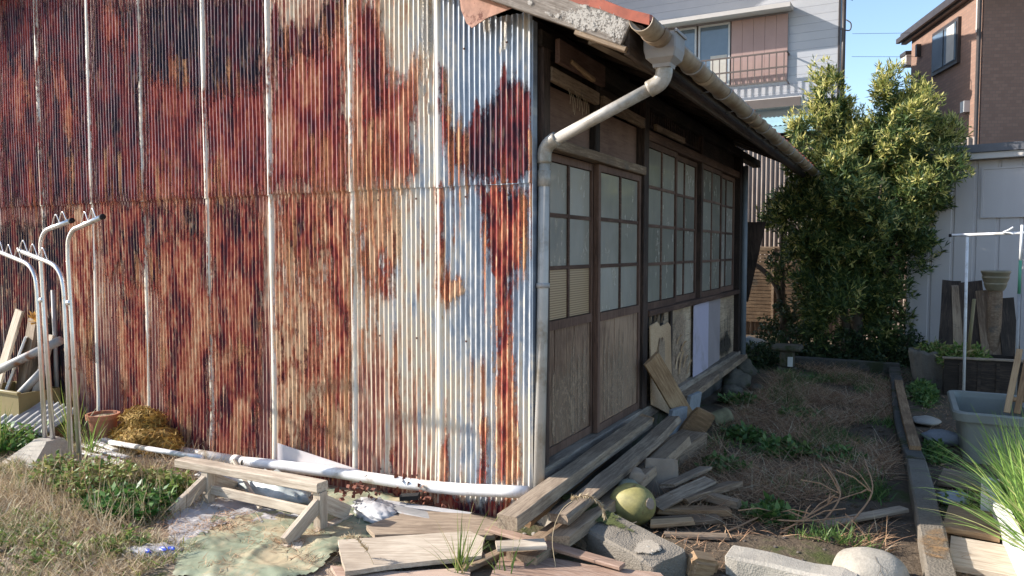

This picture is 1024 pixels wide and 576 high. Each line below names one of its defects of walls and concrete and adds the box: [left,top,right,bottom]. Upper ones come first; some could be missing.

rust [0,0,423,461]
rust [421,63,532,485]